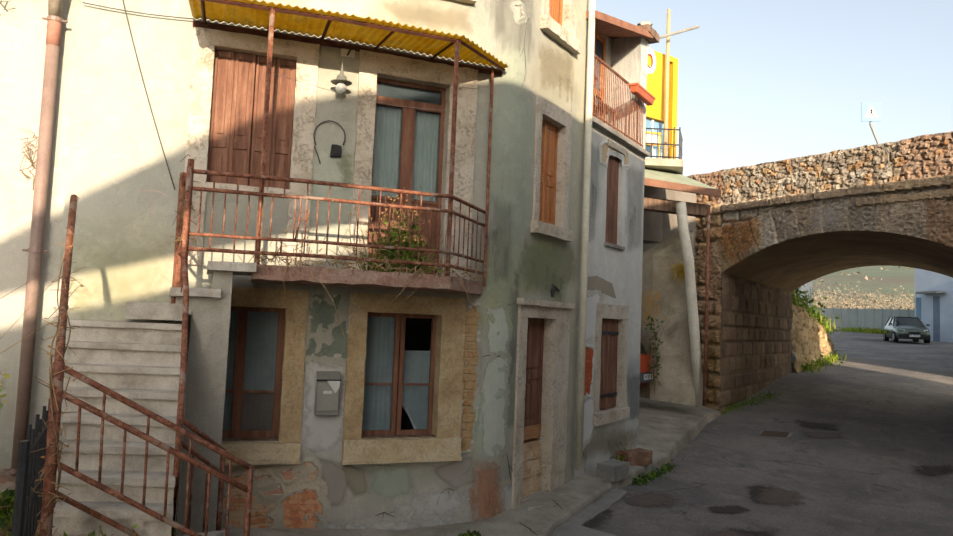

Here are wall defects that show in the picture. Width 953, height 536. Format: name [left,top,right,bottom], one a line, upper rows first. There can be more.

peeling [304,285,355,365]
peeling [460,298,513,466]
flaking render [576,289,602,450]
flaking render [222,450,331,529]